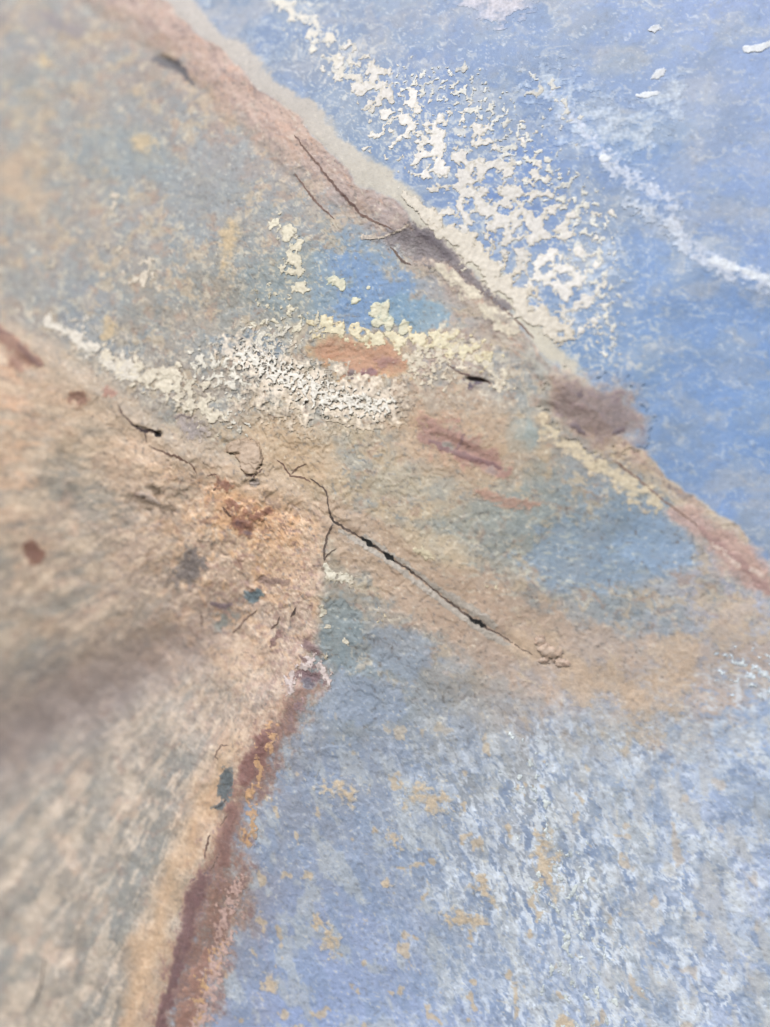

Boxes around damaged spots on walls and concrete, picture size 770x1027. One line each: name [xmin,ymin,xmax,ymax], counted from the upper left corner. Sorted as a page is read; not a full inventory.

peeling [272,0,629,359]
peeling [636,67,667,98]
peeling [743,40,770,53]
peeling [43,212,517,488]
crack [117,404,231,517]
crack [232,608,296,634]
crack [243,459,532,655]
corrosion [141,668,375,1027]